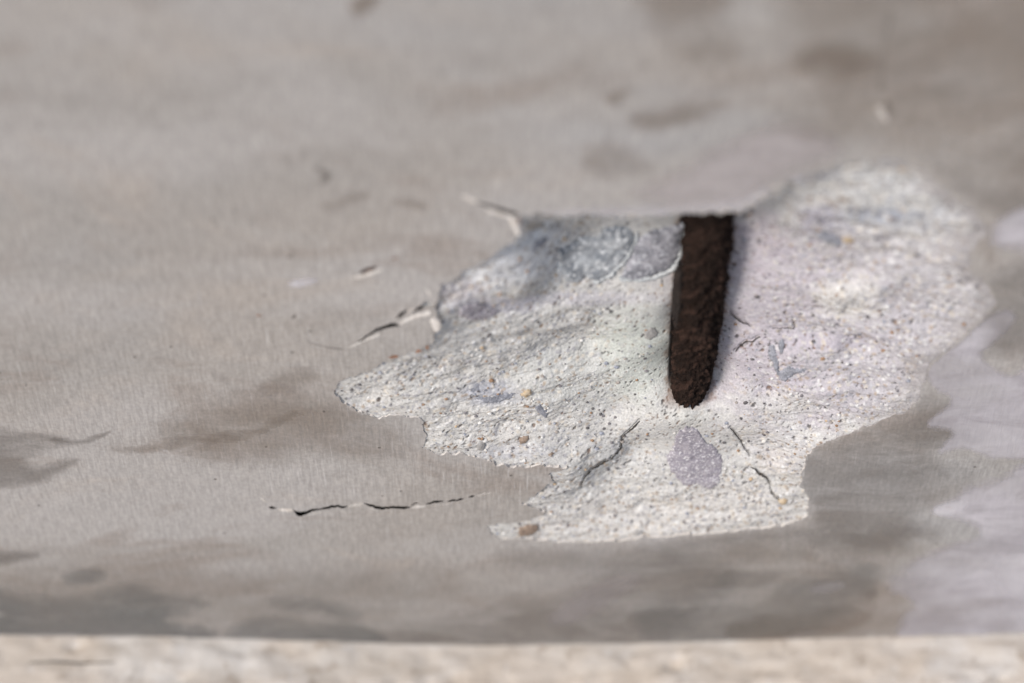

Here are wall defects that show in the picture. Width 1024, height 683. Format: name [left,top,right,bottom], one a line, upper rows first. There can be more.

crack [349,288,442,348]
spalling [332,156,997,543]
corrosion [670,210,736,410]
crack [260,495,474,516]
leakage [894,311,1024,636]